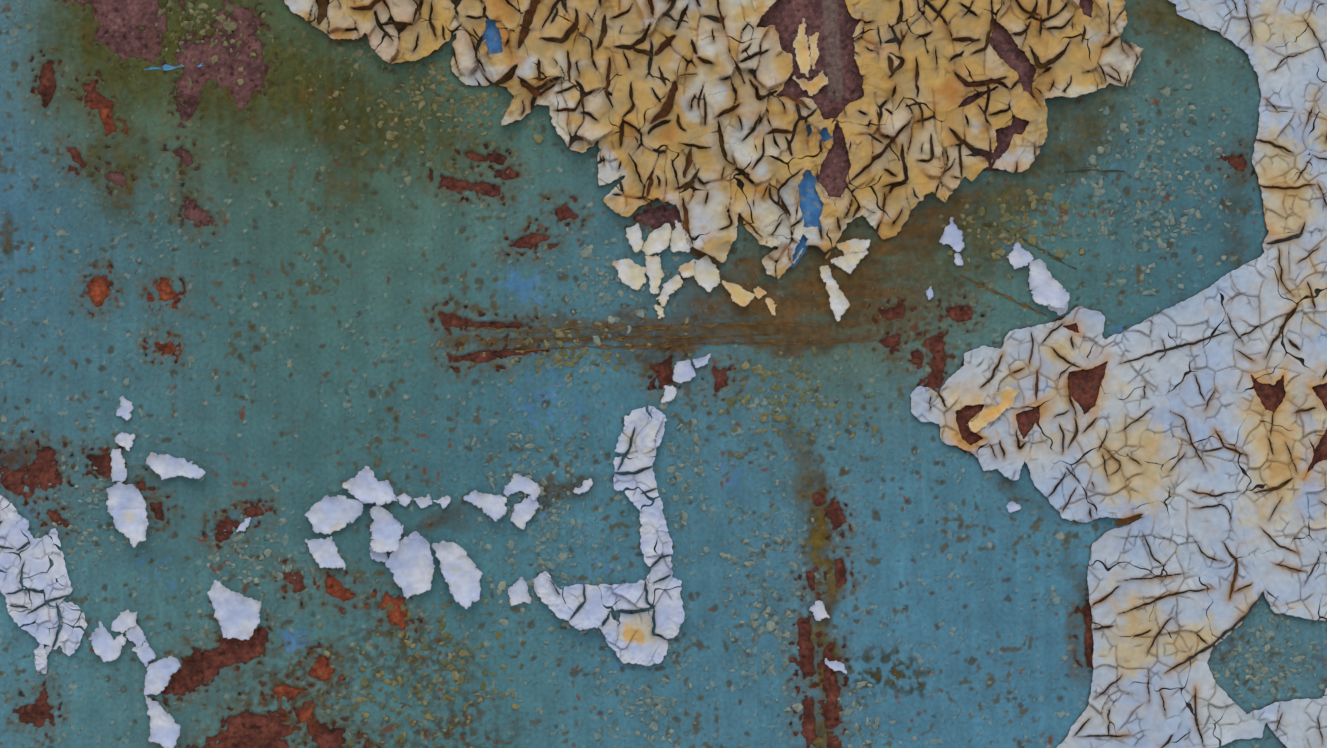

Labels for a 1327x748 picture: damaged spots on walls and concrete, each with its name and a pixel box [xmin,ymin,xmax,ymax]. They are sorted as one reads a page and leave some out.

crack [317,0,1118,269]
crack [1232,0,1253,41]
peeling [0,396,181,748]
peeling [145,452,206,480]
corrosion [161,619,271,703]
peeling [200,317,721,748]
corrosion [562,196,982,391]
peeling [284,0,1327,748]
corrosion [789,471,925,748]
corrosion [956,404,990,455]
corrosion [1059,361,1108,415]
crack [981,19,1327,748]